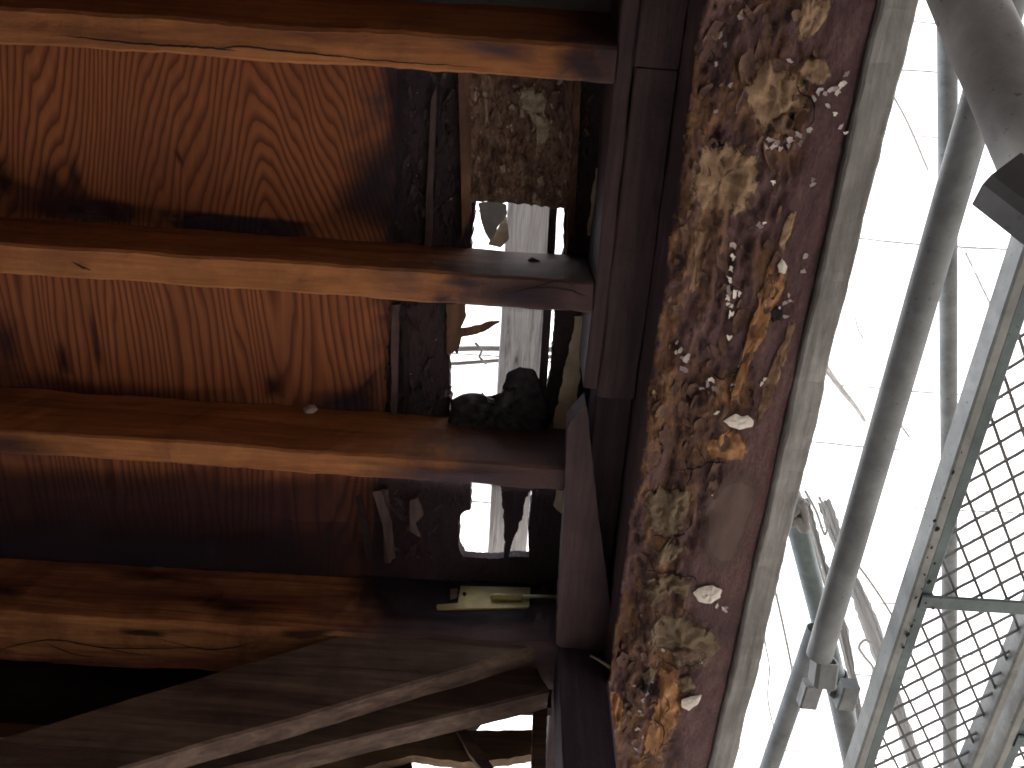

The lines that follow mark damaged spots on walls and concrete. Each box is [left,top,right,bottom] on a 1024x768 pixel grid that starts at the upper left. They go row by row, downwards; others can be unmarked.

crack [60,35,480,68]
peeling [649,0,850,501]
crack [0,638,253,657]
peeling [610,476,728,765]